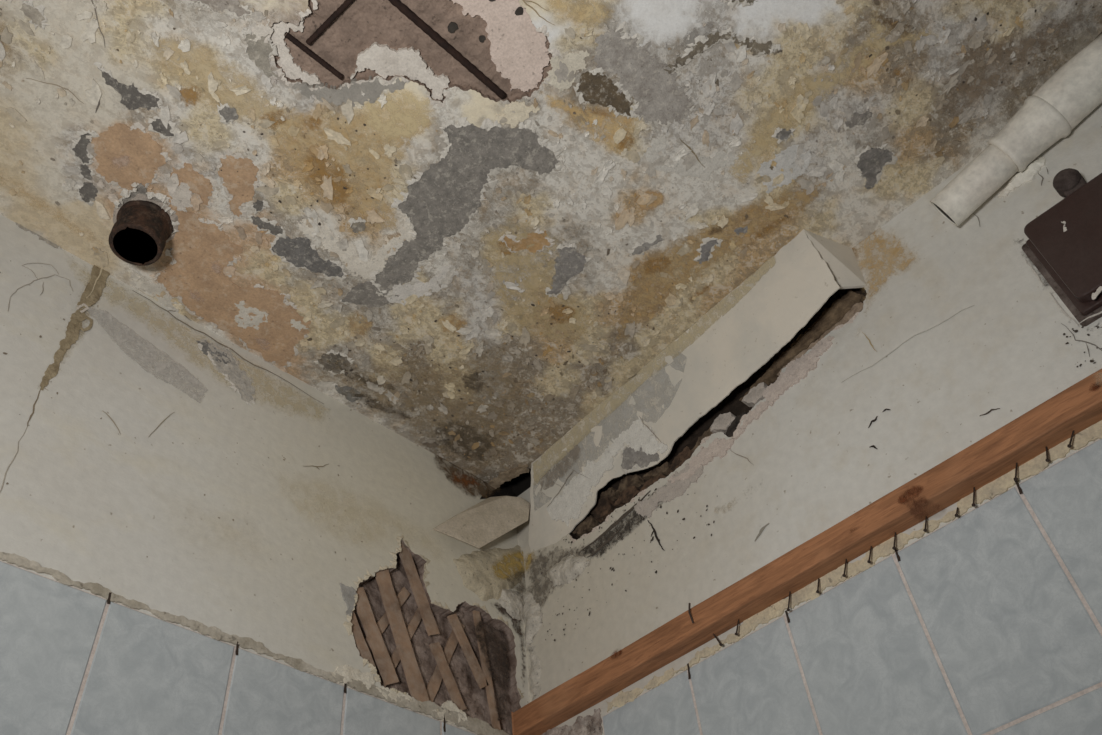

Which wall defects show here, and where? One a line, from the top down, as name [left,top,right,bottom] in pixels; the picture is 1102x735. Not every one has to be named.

peeling [0,0,108,91]
damp [942,22,1072,112]
damp [155,39,429,237]
spalling [50,0,1054,548]
damp [341,344,522,499]
damp [533,257,775,483]
peeling [343,546,402,636]
damp [493,485,685,606]
crack [581,491,664,558]
peeling [363,659,407,695]